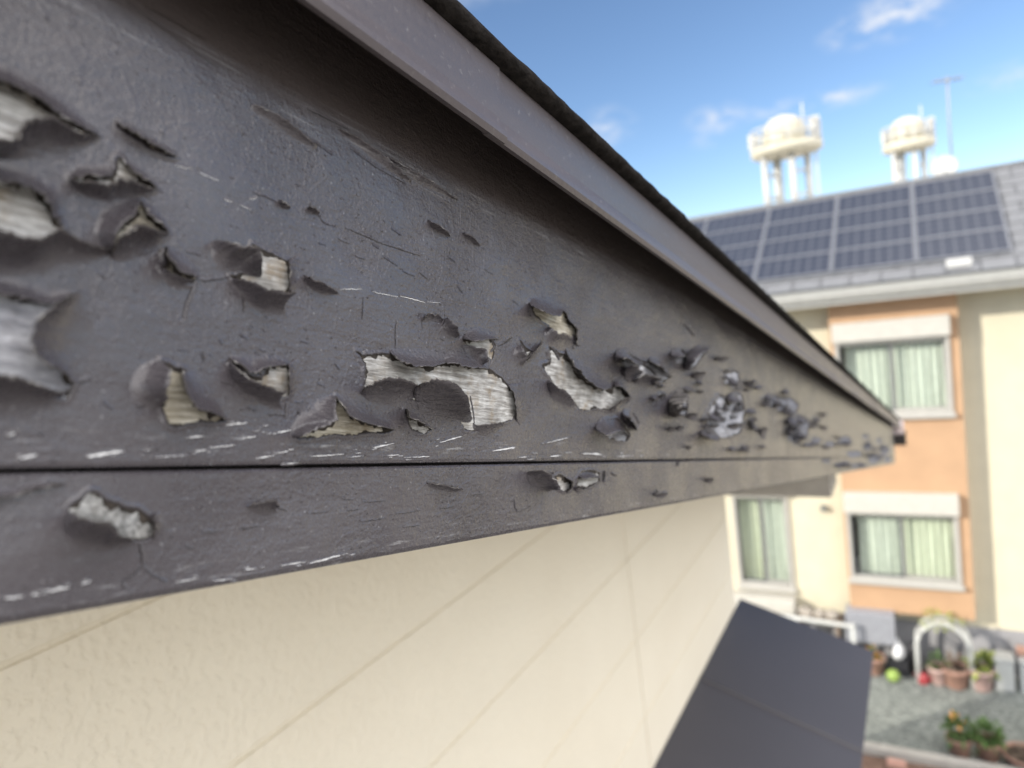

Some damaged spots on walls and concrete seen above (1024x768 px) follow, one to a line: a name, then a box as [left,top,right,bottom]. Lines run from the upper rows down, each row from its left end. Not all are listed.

peeling [0,63,174,418]
peeling [211,239,339,317]
peeling [129,292,891,470]
peeling [527,467,617,495]
peeling [62,485,168,588]